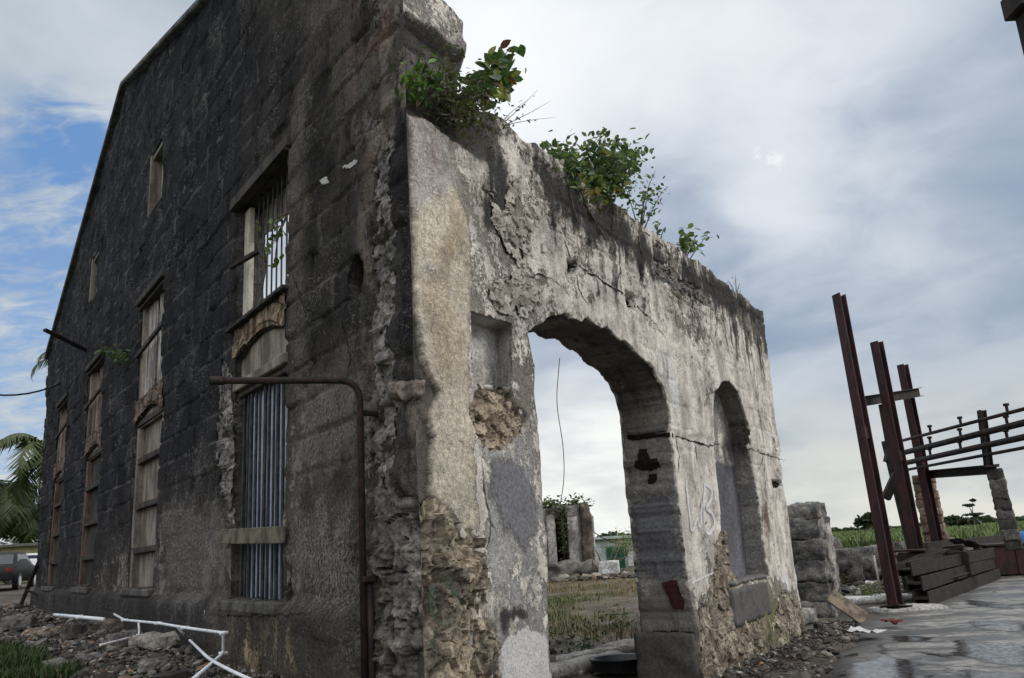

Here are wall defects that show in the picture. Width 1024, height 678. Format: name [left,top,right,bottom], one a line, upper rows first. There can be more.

flaking render [368,139,399,492]
damp [484,151,511,240]
peeling [482,175,548,318]
damp [533,155,764,379]
flaking render [215,361,236,525]
flaking render [467,383,525,454]
crack [627,432,720,472]
flaking render [419,498,502,678]
flaking render [697,530,804,678]